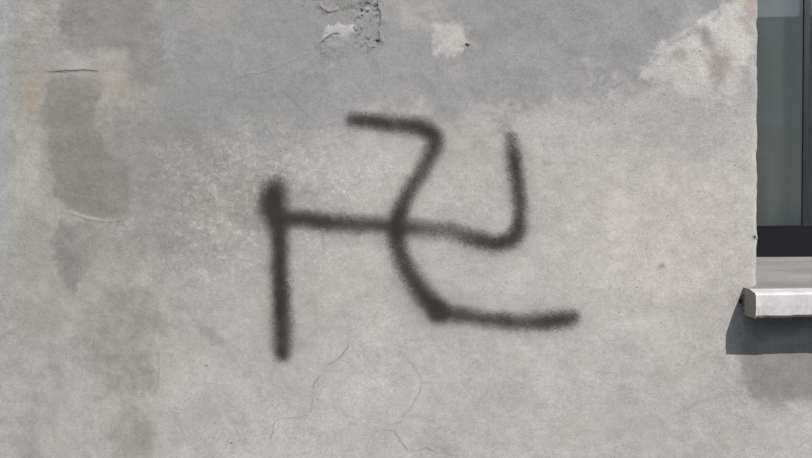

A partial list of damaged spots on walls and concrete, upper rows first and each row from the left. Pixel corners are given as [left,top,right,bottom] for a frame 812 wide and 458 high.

spalling [312,0,390,56]
water stain [40,0,716,298]
water stain [65,267,170,458]
crack [270,341,350,458]
crack [382,357,459,458]
water stain [675,314,812,416]